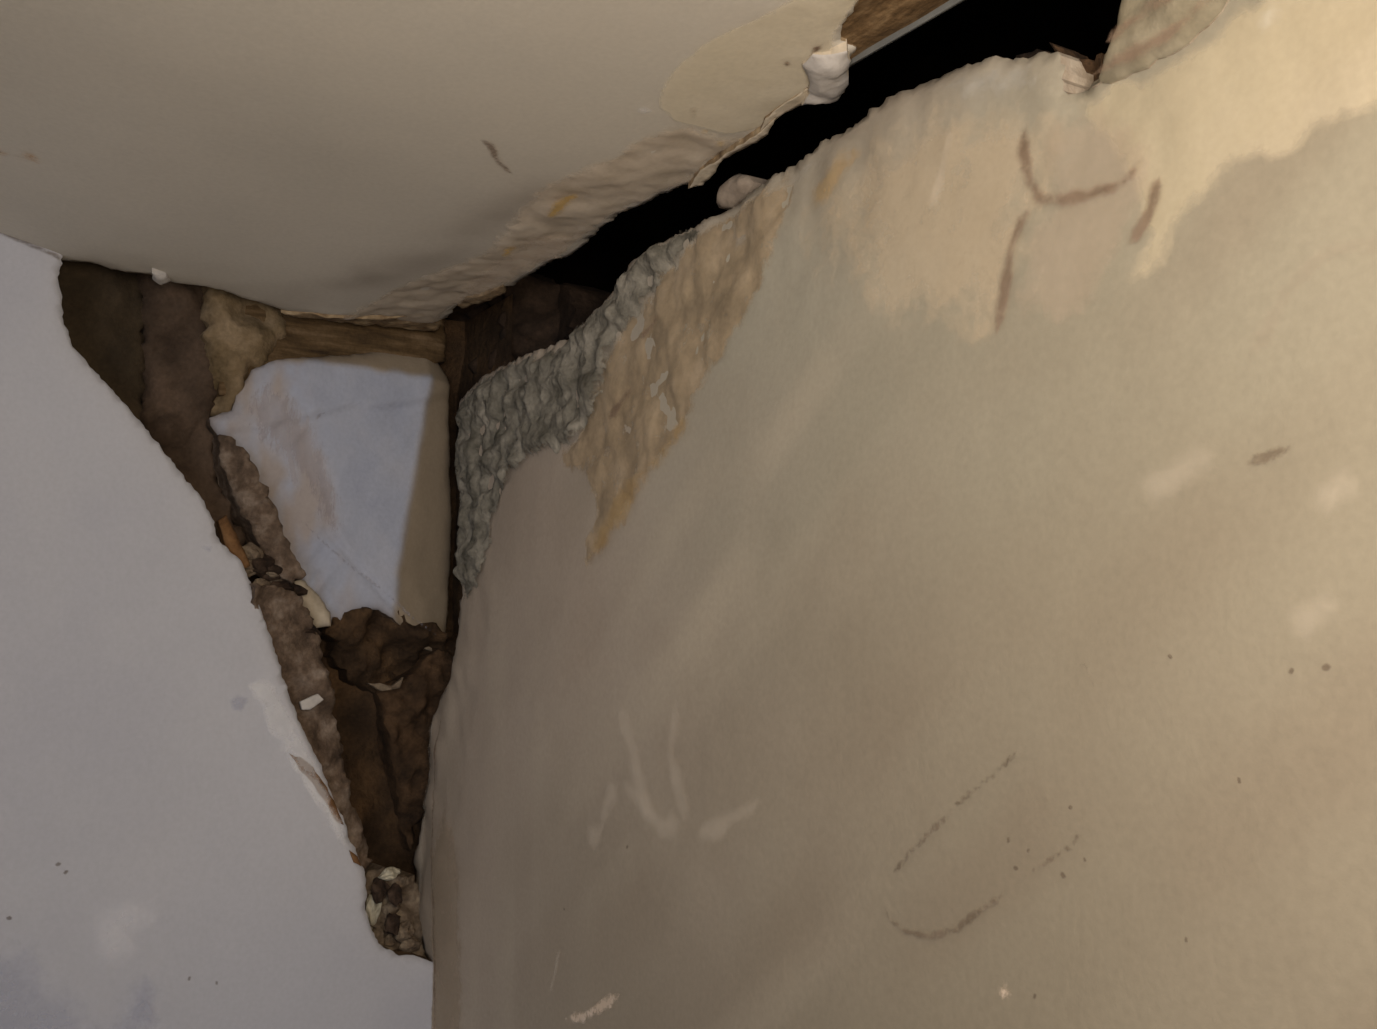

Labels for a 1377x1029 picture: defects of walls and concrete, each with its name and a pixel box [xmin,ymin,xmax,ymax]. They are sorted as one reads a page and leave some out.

peeling [1092,0,1229,88]
spalling [58,87,809,958]